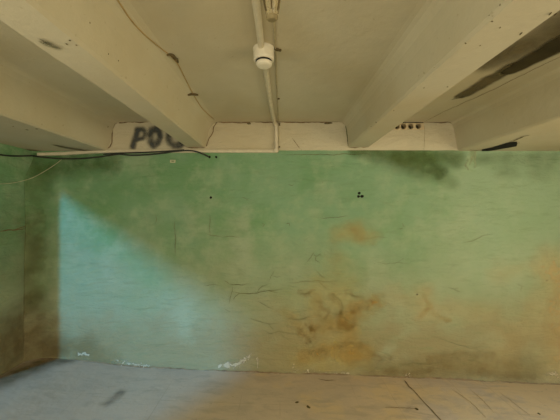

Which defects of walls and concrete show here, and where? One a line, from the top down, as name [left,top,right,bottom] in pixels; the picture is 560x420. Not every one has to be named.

leakage [455,12,560,98]
leakage [389,151,438,170]
leakage [0,359,60,382]